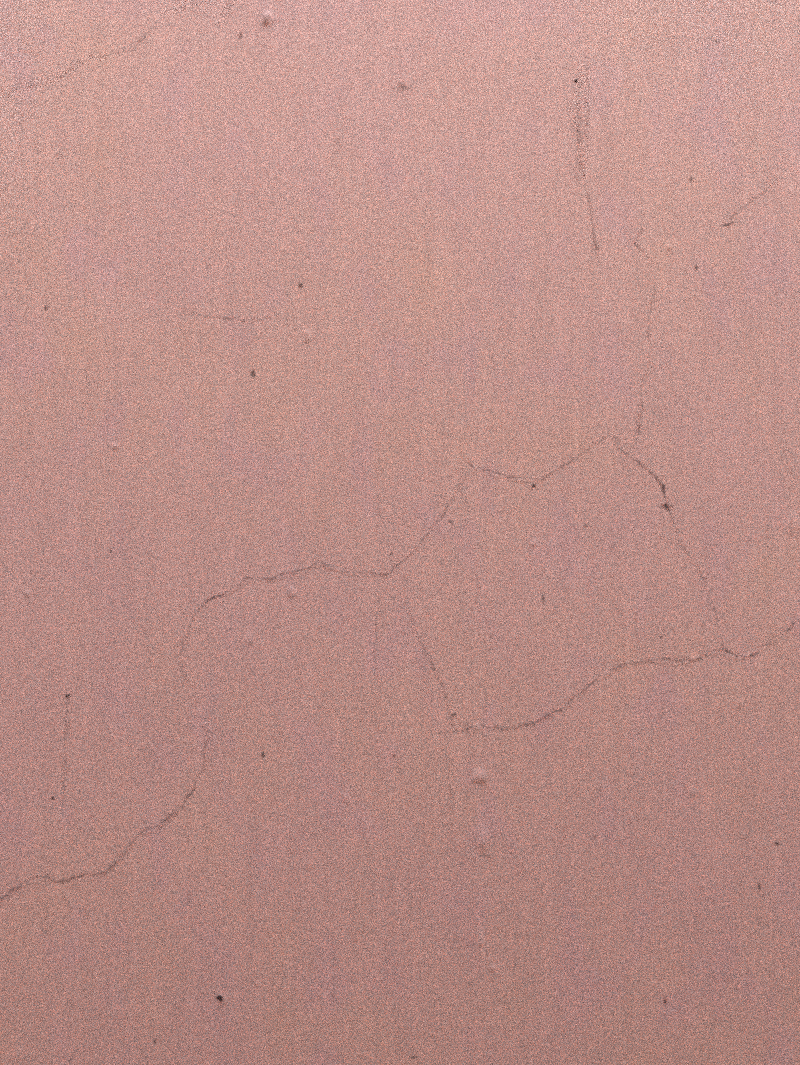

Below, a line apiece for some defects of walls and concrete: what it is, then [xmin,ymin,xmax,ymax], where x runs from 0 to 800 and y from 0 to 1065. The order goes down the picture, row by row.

crack [213,561,383,601]
crack [533,627,791,726]
crack [0,805,185,906]